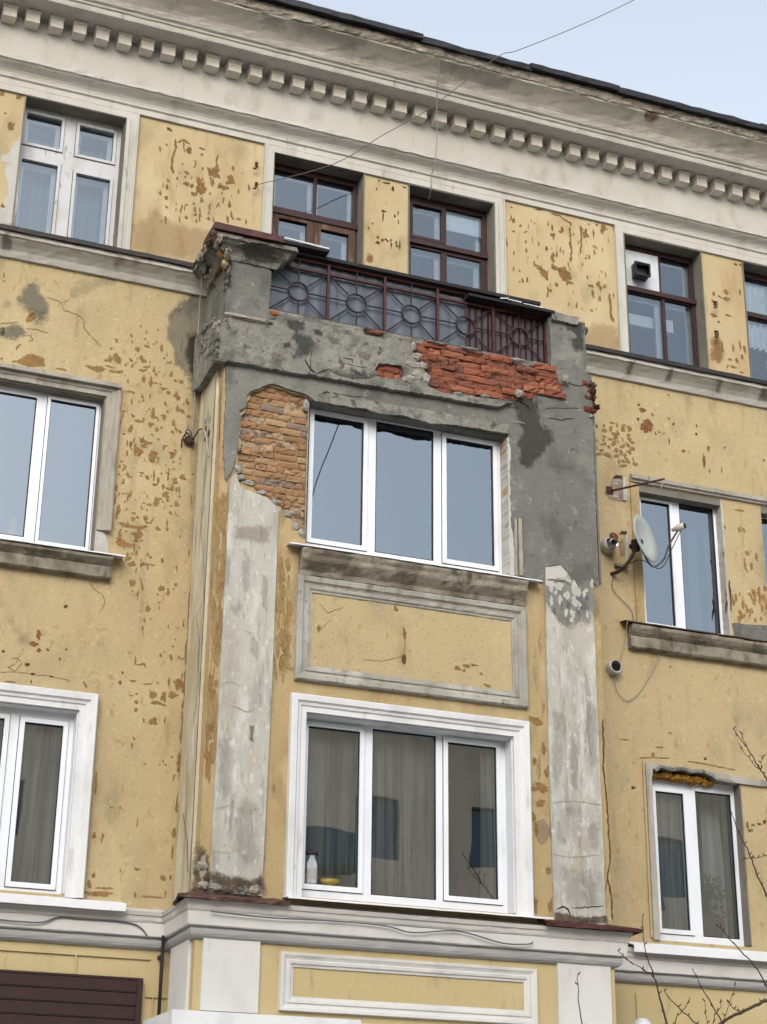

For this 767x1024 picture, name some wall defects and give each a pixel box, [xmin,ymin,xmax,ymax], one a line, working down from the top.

damp [0,326,25,340]
damp [18,284,48,320]
spalling [159,127,250,291]
peeling [506,206,614,322]
peeling [86,325,194,636]
spalling [234,386,309,538]
spalling [375,340,675,502]
damp [513,397,553,467]
peeling [545,569,598,626]
peeling [118,583,191,812]
spalling [188,847,265,898]
crack [554,720,613,920]